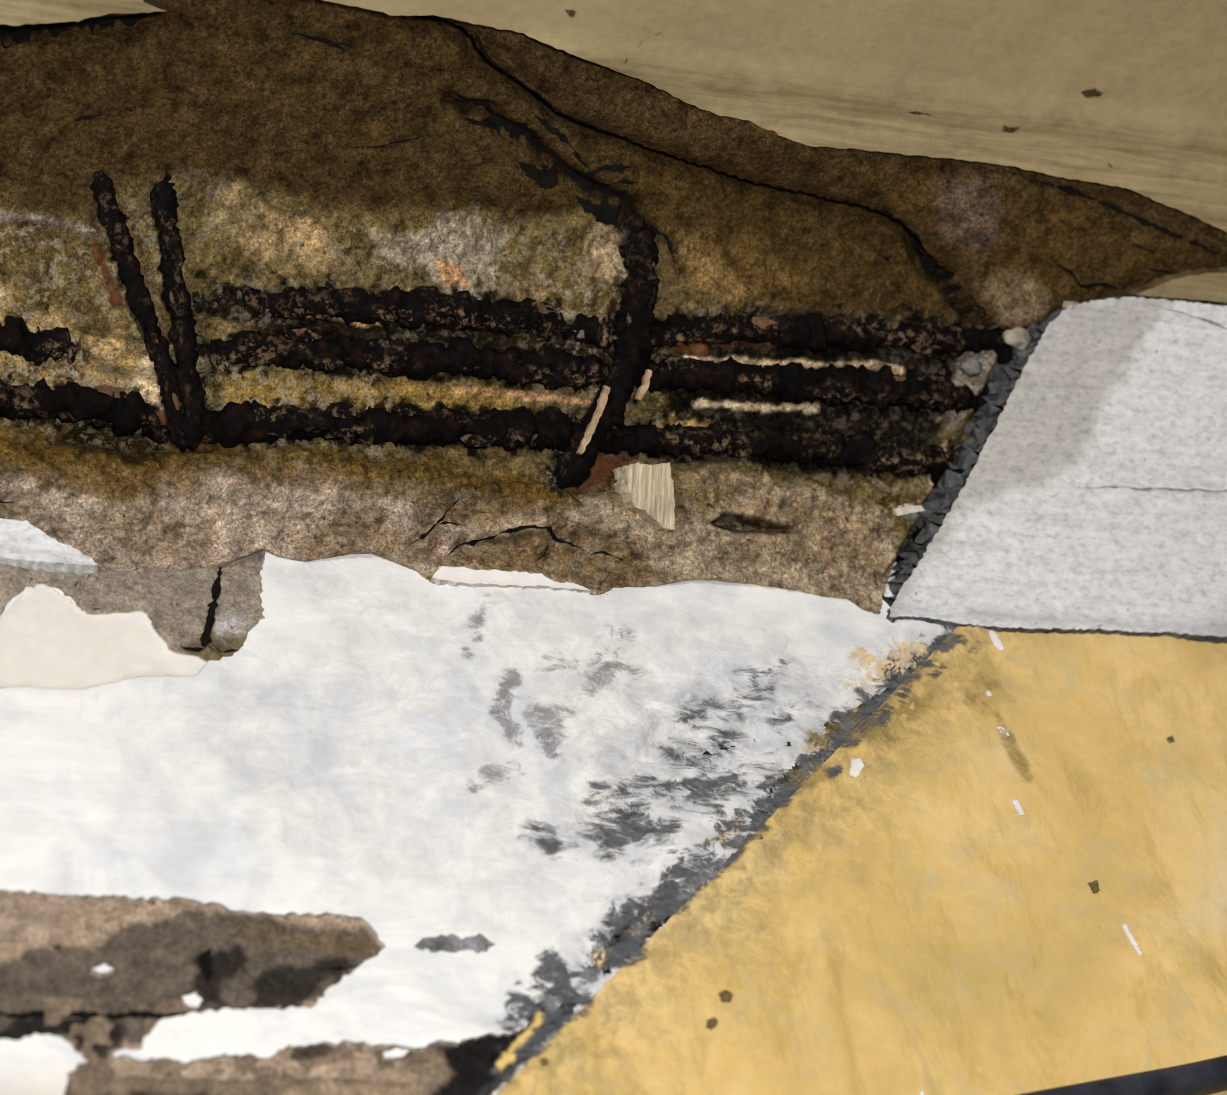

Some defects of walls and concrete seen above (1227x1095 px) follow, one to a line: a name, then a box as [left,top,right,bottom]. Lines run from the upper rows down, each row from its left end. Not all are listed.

corrosion [92,244,122,307]
corrosion [283,314,331,342]
spalling [0,0,1013,690]
corrosion [664,316,778,370]
corrosion [156,393,191,425]
corrosion [254,408,293,437]
corrosion [566,452,633,498]
damp [463,613,484,658]
damp [1003,733,1028,775]
damp [469,765,508,793]
damp [478,624,979,1095]
flaking render [0,892,553,1095]